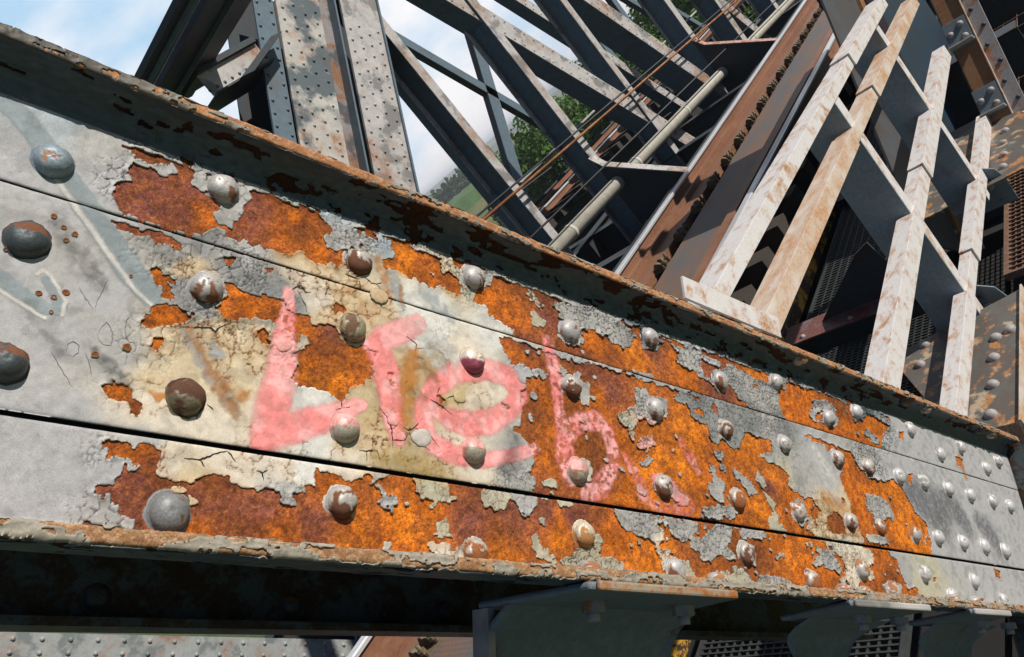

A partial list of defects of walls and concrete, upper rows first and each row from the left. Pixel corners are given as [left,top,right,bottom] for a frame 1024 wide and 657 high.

peeling [38,45,120,79]
peeling [39,85,1024,612]
corrosion [400,349,419,426]
crack [185,450,235,467]